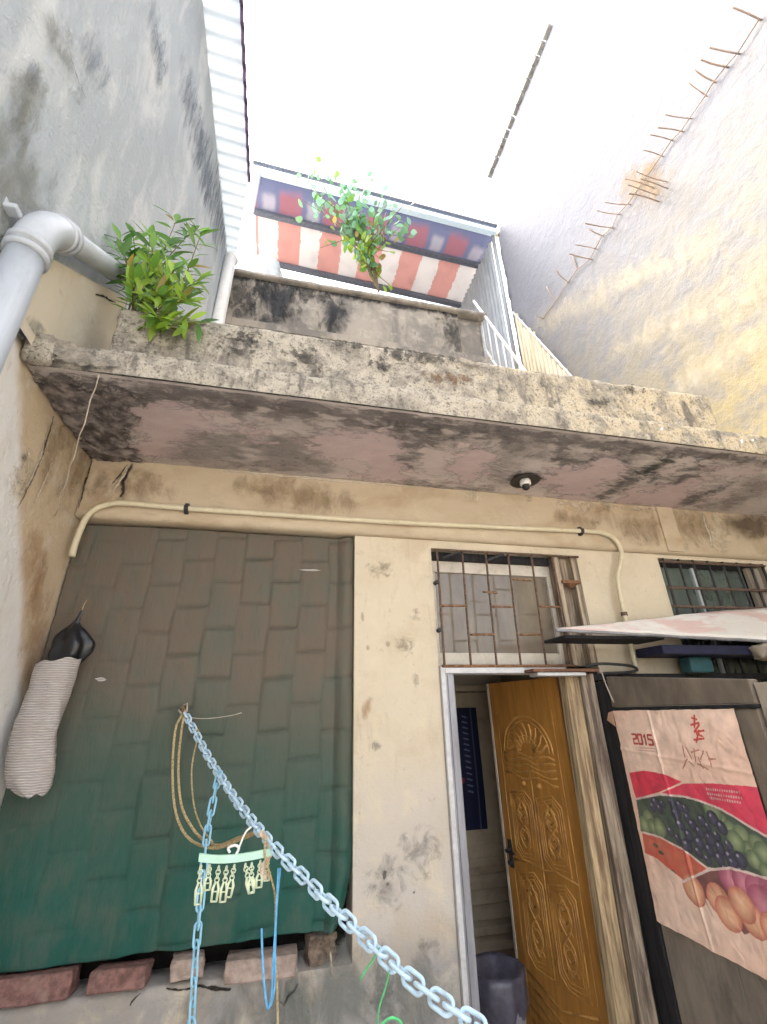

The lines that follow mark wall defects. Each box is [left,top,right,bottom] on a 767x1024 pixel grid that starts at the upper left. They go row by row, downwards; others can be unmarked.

leakage [219,275,461,372]
crack [21,416,54,502]
crack [78,460,133,508]
leakage [62,373,767,509]